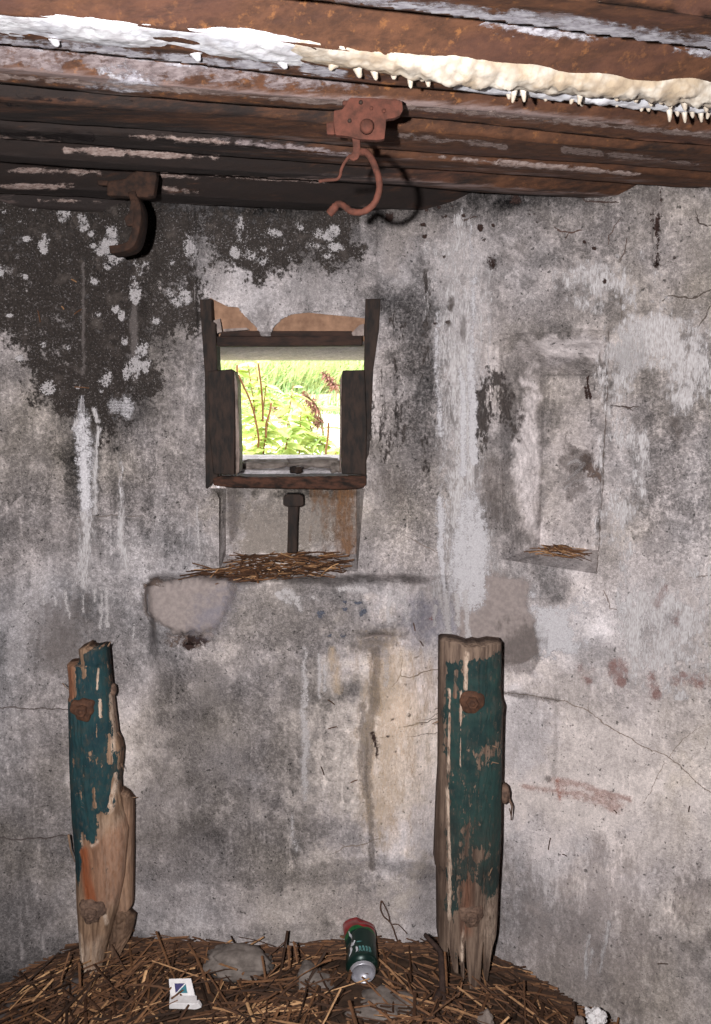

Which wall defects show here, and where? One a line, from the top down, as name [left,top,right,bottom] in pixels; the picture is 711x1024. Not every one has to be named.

damp [0,15,711,138]
damp [0,131,351,160]
damp [397,133,699,176]
damp [0,168,368,629]
damp [368,210,524,638]
damp [299,648,327,801]
crack [504,692,711,804]